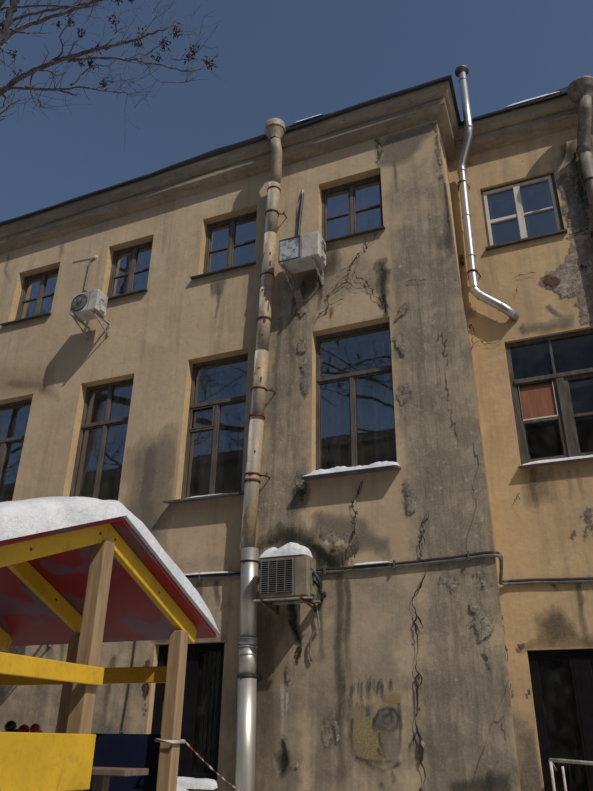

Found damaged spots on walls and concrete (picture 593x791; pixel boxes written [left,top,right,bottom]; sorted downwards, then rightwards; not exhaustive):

crack [312,233,389,328]
spalling [539,170,593,325]
leakage [257,601,299,771]
leakage [260,513,389,685]
crack [345,481,363,560]
crack [412,513,429,791]